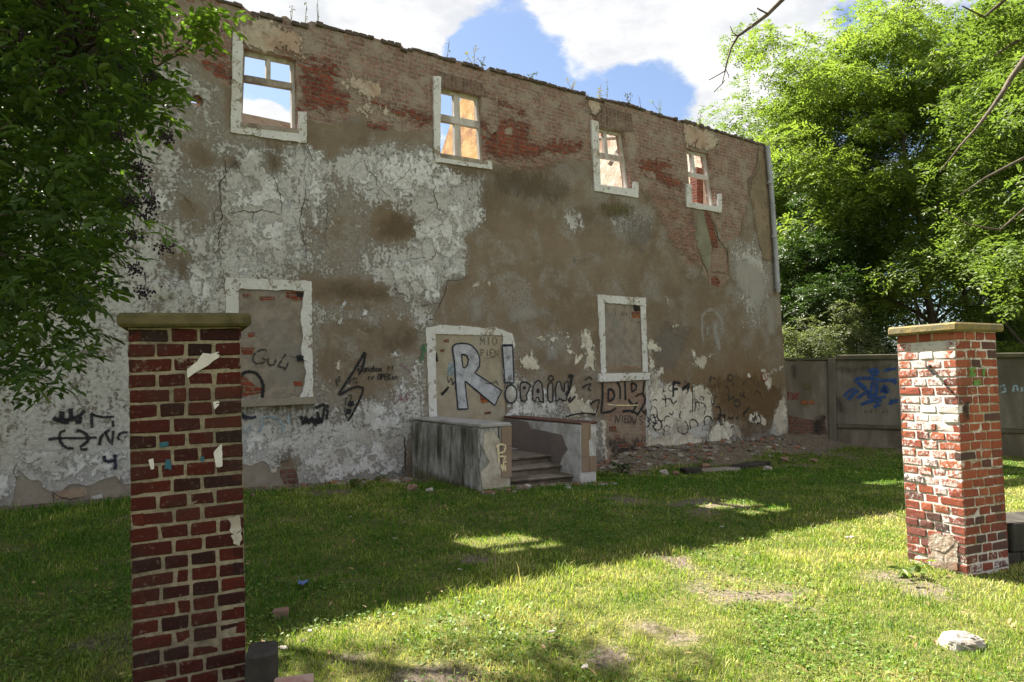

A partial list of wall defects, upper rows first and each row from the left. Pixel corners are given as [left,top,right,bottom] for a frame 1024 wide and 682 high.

flaking render [297,53,432,131]
flaking render [480,99,583,161]
crack [176,144,336,274]
crack [353,155,445,214]
flaking render [633,157,730,287]
peeling [749,150,774,264]
crack [394,252,466,327]
peeling [0,446,131,506]